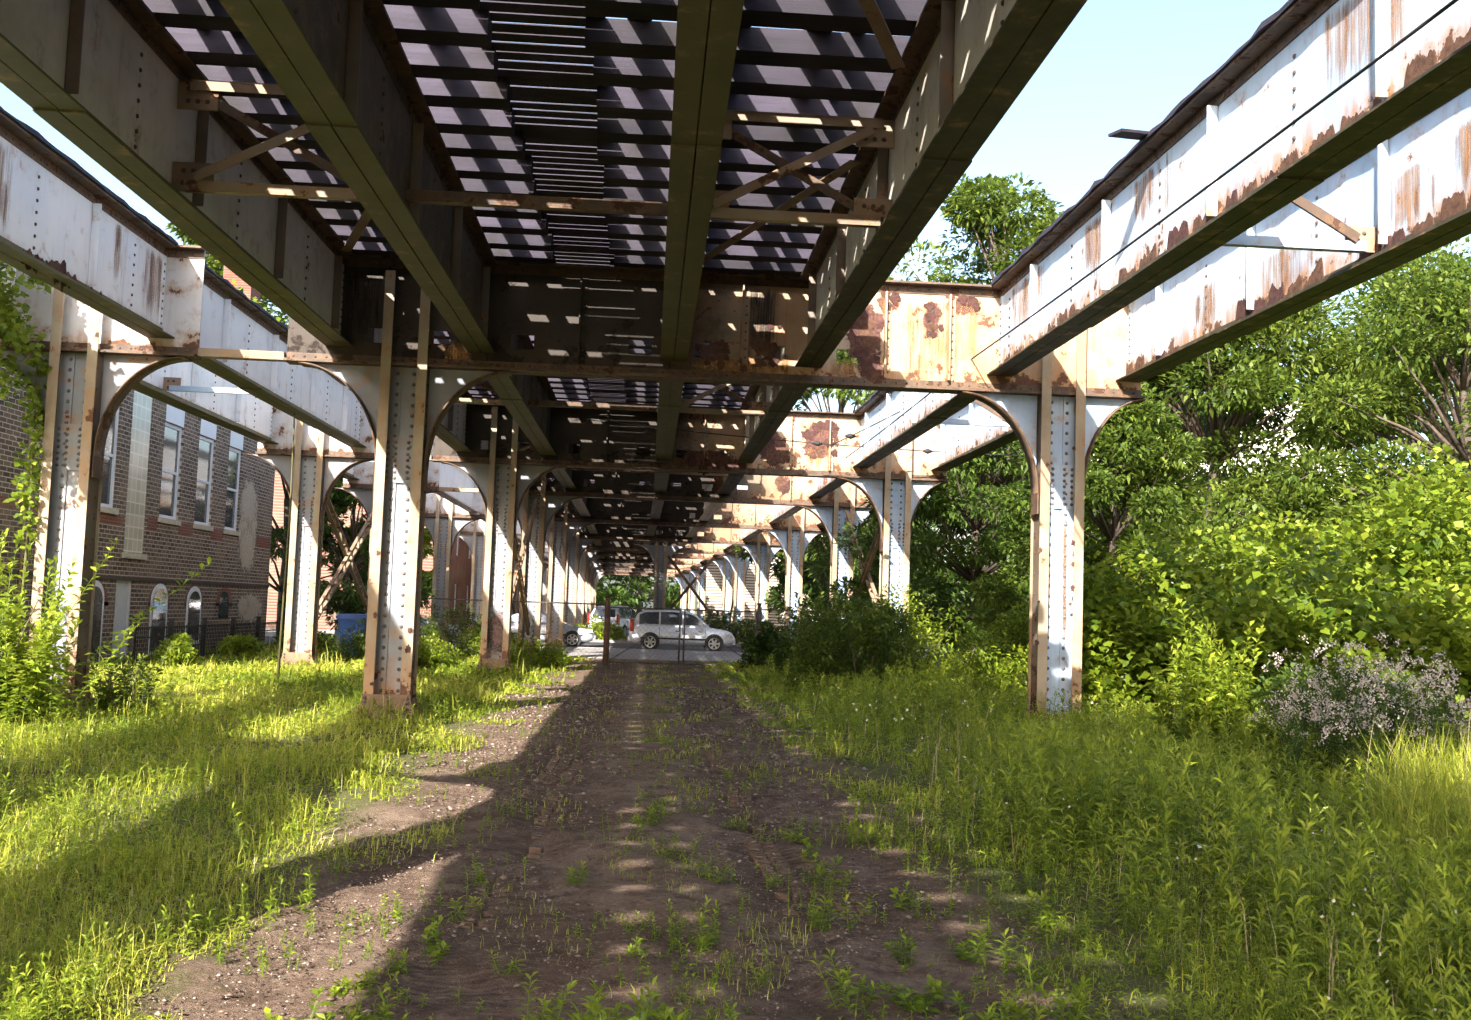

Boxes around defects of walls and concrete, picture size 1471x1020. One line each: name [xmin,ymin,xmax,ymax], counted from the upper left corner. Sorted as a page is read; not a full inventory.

corrosion [1118,110,1366,283]
corrosion [1358,124,1471,262]
corrosion [26,248,77,281]
corrosion [145,253,161,308]
corrosion [1196,282,1215,328]
corrosion [1235,249,1324,321]
corrosion [699,355,788,373]
corrosion [908,309,976,373]
corrosion [1126,345,1179,375]